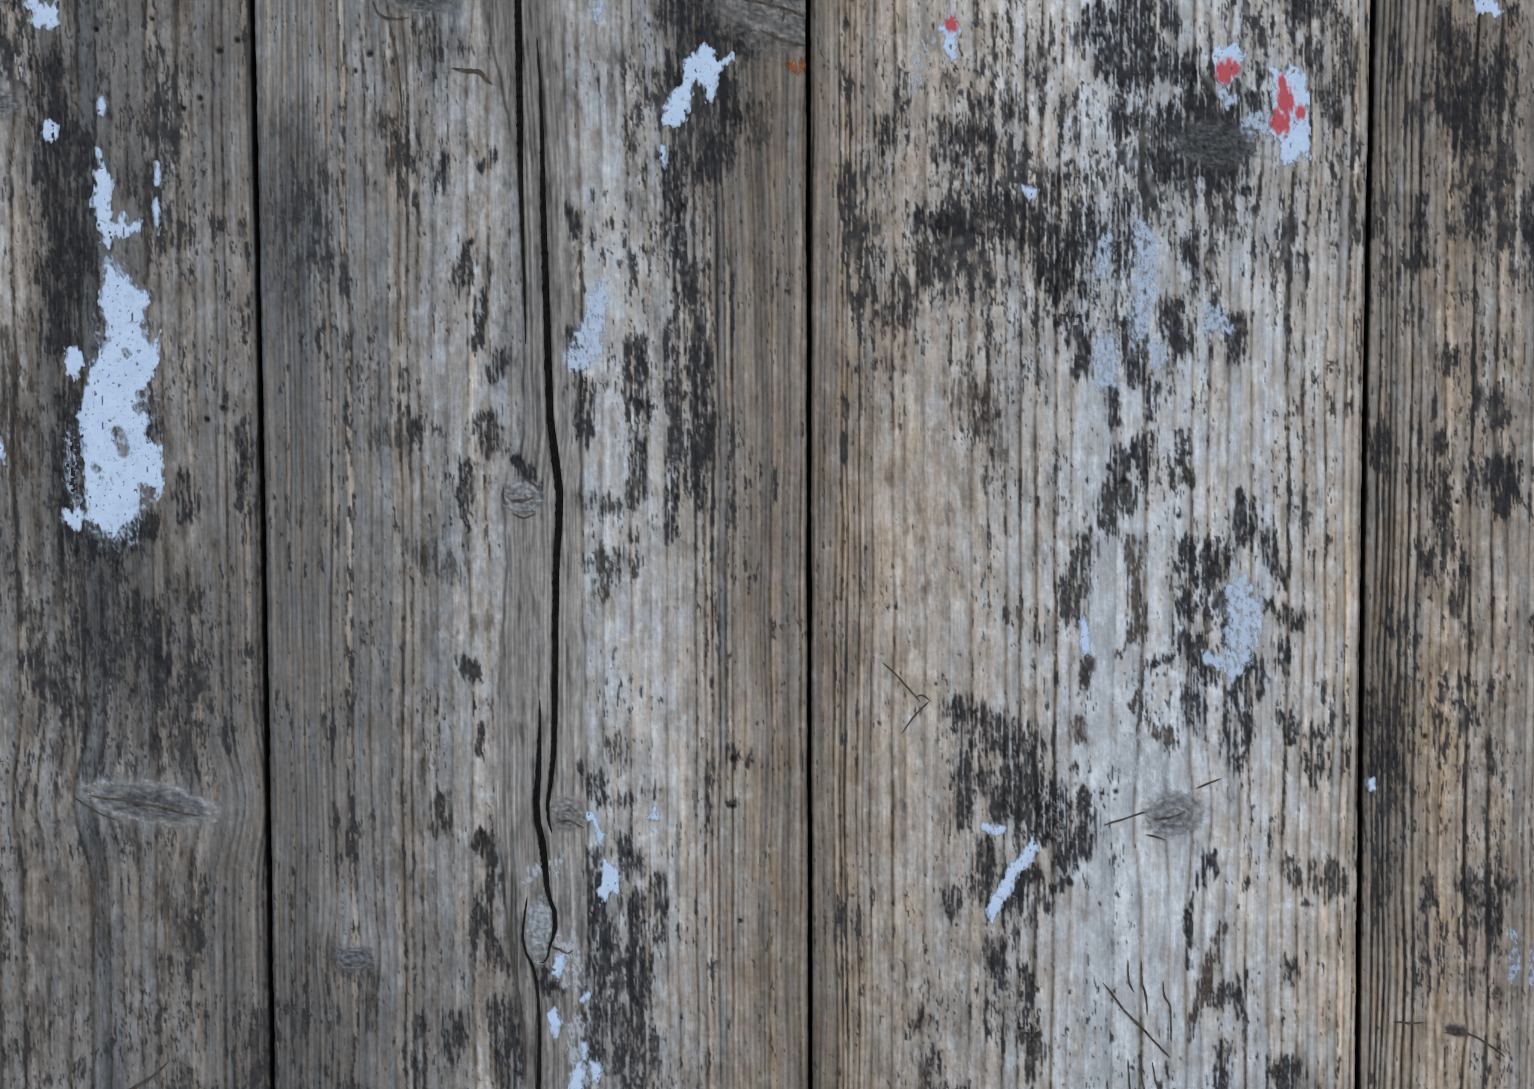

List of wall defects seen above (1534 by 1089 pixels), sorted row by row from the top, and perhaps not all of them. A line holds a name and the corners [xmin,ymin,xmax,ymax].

peeling [1217,88,1270,143]
peeling [64,256,148,382]
peeling [62,431,148,544]
crack [452,0,584,1089]